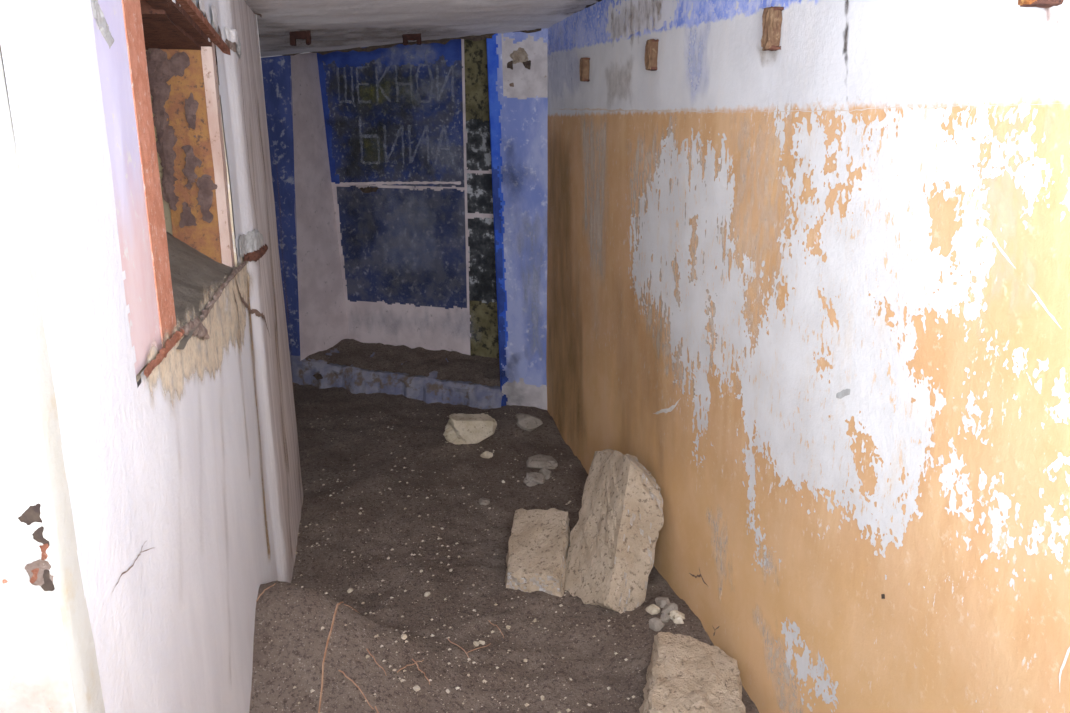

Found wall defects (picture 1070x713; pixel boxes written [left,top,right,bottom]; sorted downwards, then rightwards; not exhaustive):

spalling [507,47,531,70]
peeling [598,0,693,41]
spalling [144,229,270,400]
peeling [628,84,1070,591]
spalling [18,503,55,591]
peeling [775,617,838,712]